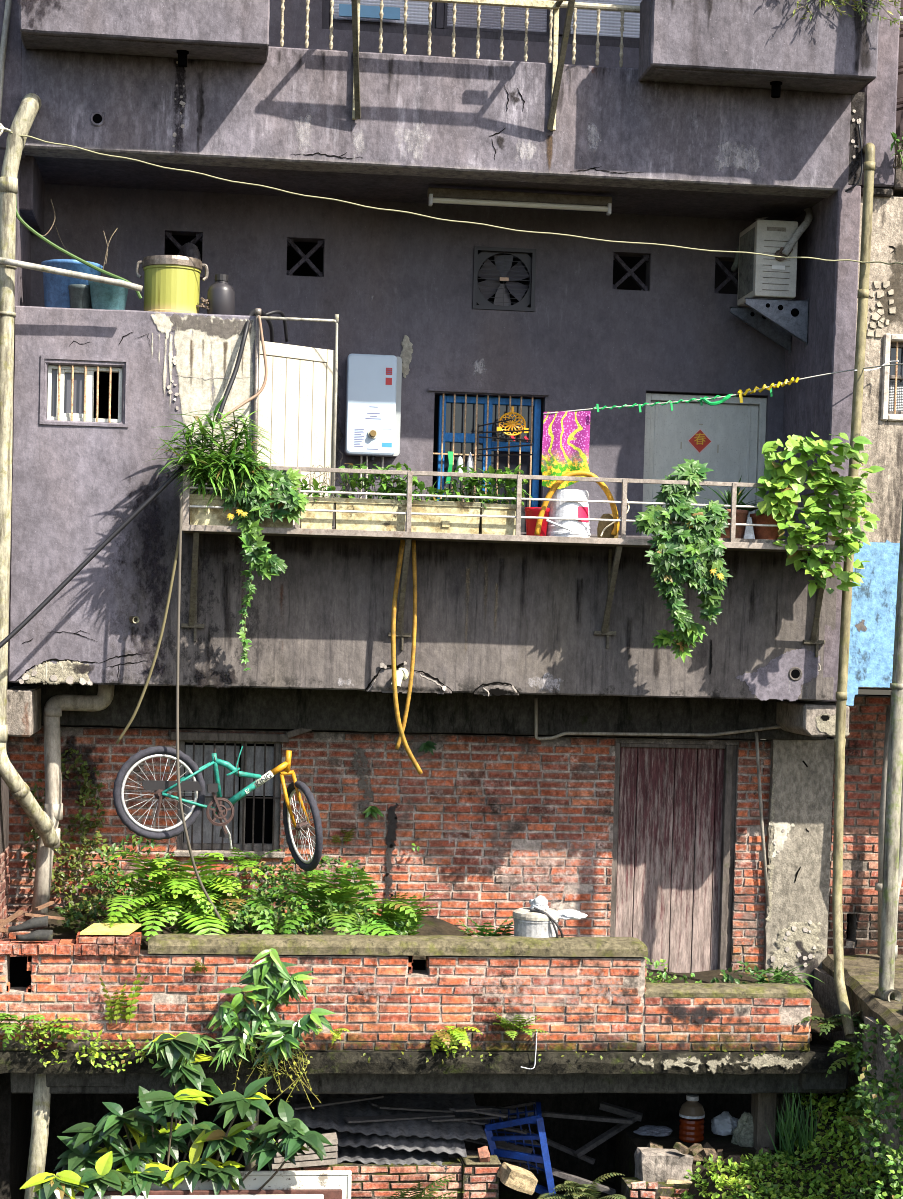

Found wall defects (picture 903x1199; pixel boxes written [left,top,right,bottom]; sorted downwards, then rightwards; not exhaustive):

water stain [20,0,63,31]
water stain [172,59,204,153]
peeling [151,312,256,463]
water stain [200,538,239,633]
spalling [16,652,148,686]
water stain [195,631,236,688]
peeling [736,648,821,701]